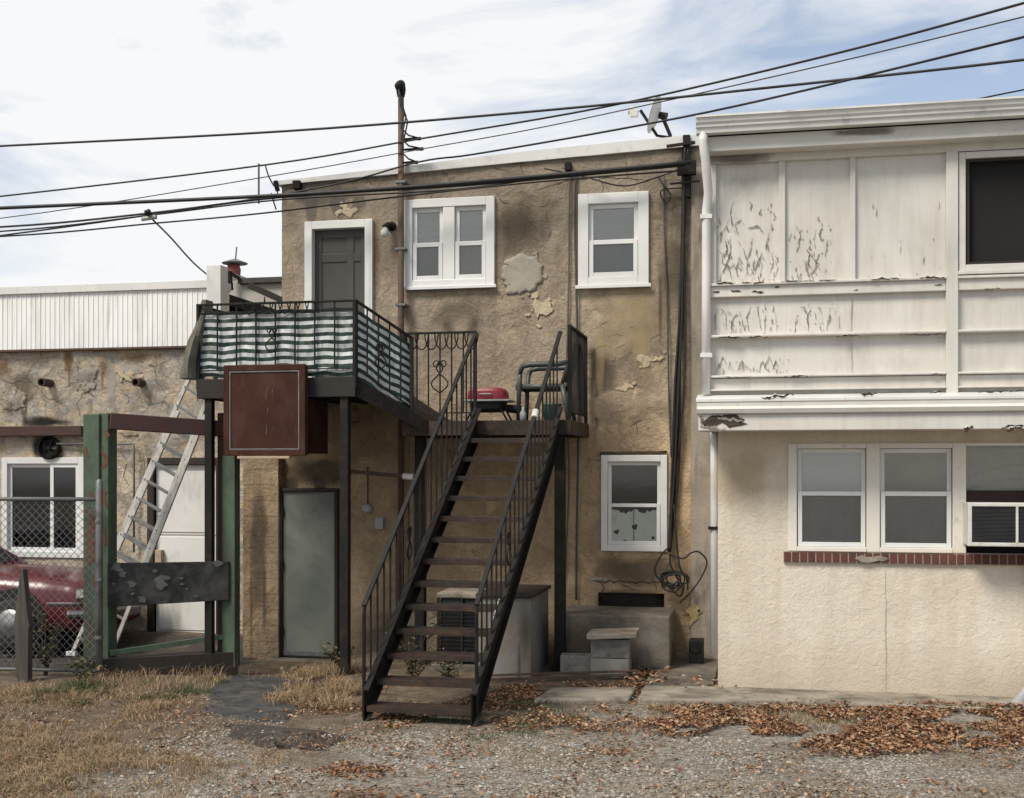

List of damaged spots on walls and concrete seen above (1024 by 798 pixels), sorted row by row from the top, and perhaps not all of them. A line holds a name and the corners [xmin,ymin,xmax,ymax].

peeling [335,202,359,218]
peeling [713,201,831,293]
peeling [508,288,553,328]
peeling [714,304,778,339]
peeling [790,303,859,337]
crack [0,353,176,417]
spalling [636,351,671,368]
peeling [716,357,808,378]
peeling [700,416,743,431]
crack [882,578,890,680]